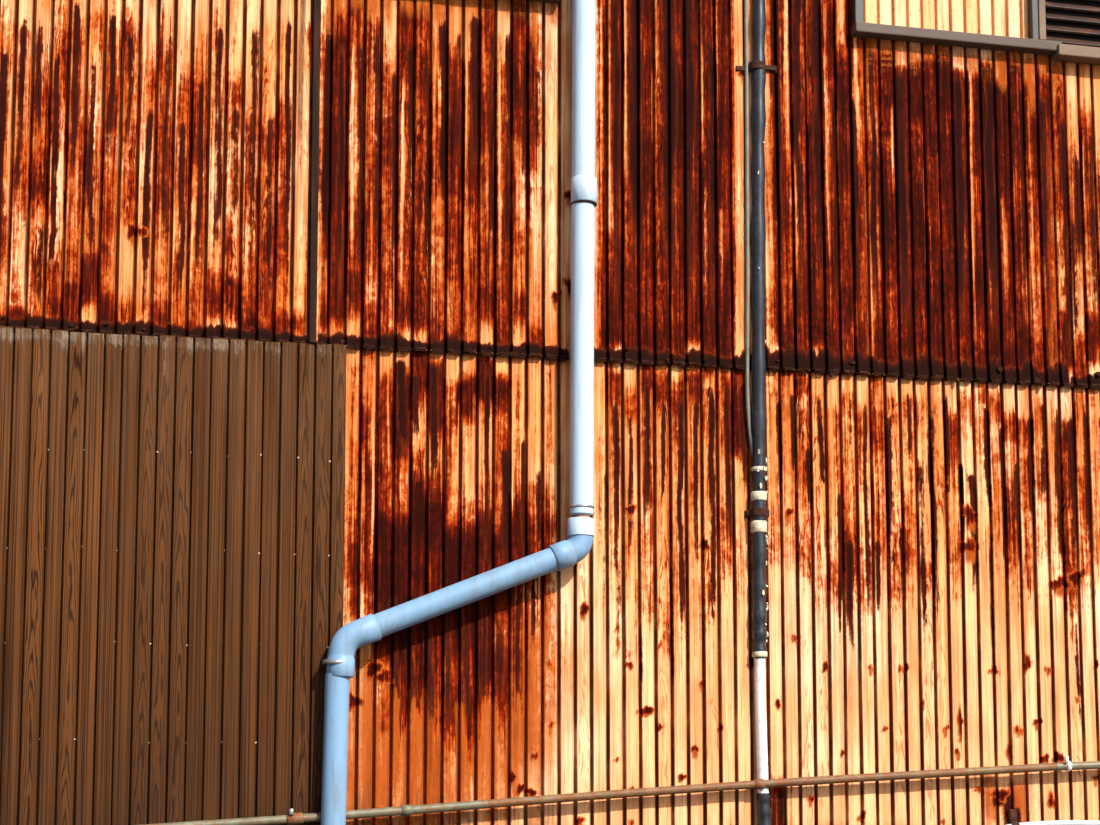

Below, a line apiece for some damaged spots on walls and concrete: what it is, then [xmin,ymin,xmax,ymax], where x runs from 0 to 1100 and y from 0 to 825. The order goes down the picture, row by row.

rust [0,0,571,622]
rust [594,0,752,688]
rust [764,0,1100,714]
rust [580,601,590,620]
rust [346,571,562,825]
rust [636,705,665,732]
rust [943,704,964,760]
rust [1006,717,1043,760]
rust [1039,751,1065,764]
rust [769,775,792,825]
rust [974,774,1026,825]